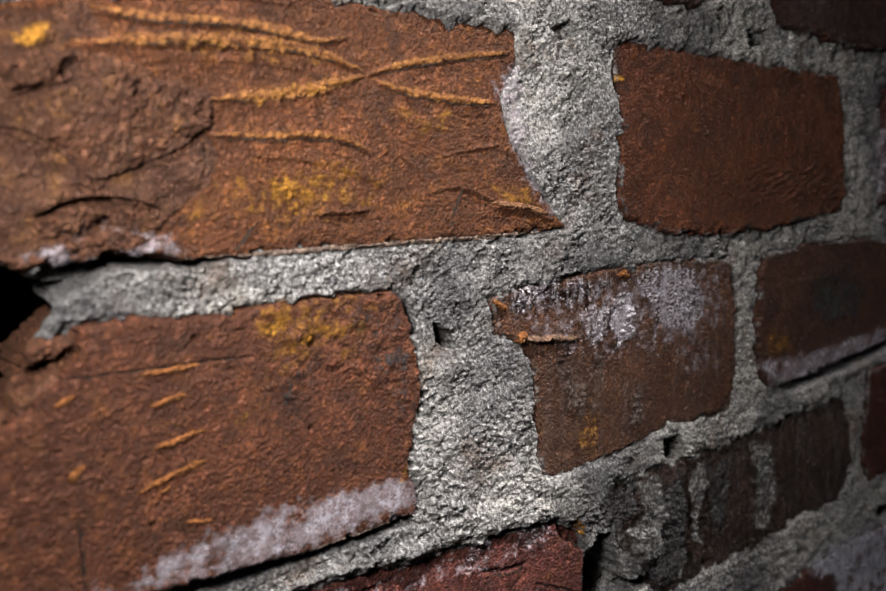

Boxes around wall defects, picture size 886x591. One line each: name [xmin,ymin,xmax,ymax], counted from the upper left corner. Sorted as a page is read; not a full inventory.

crack [103,13,336,63]
crack [375,57,505,107]
spalling [0,0,221,275]
crack [224,137,360,151]
water stain [511,263,711,414]
water stain [136,479,416,586]